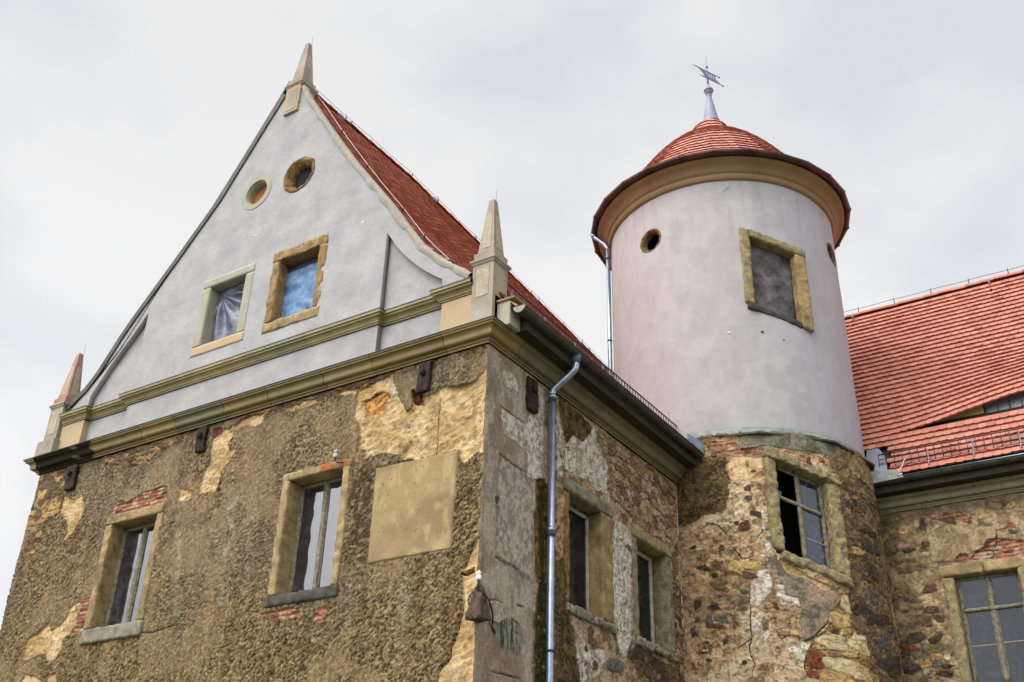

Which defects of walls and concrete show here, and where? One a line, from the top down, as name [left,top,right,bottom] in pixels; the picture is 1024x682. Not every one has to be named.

peeling [503,370,518,393]
flaking render [99,364,487,514]
spalling [27,469,86,556]
peeling [501,386,548,583]
flaking render [954,522,1024,563]
flaking render [22,598,90,682]